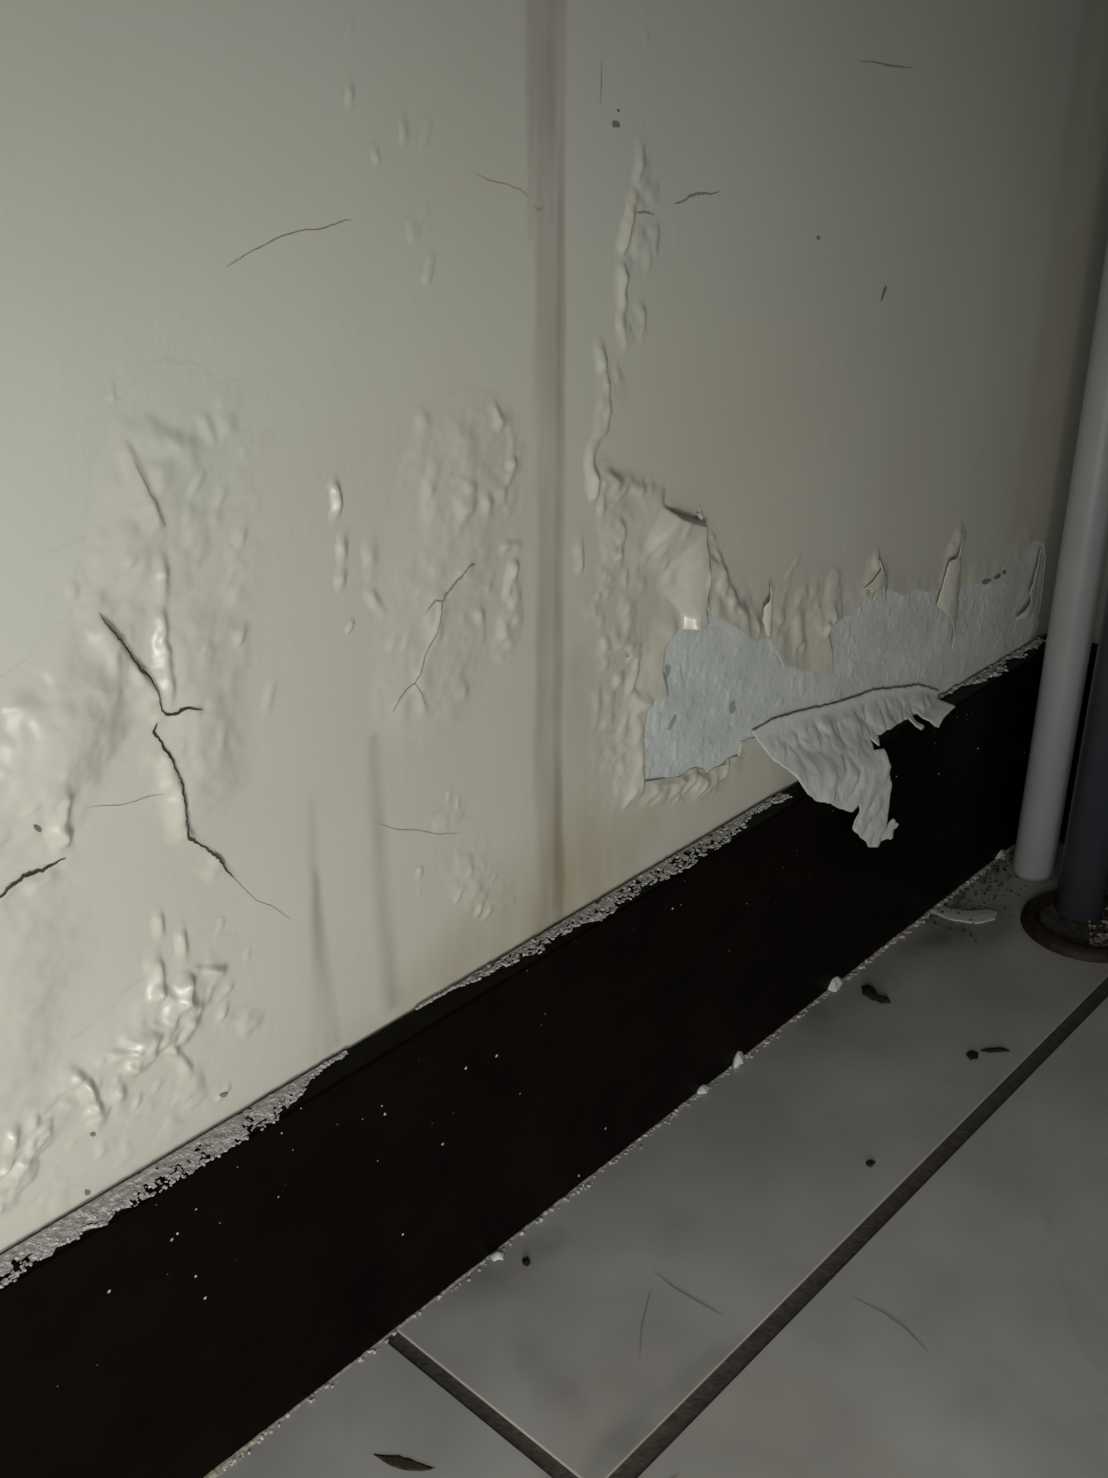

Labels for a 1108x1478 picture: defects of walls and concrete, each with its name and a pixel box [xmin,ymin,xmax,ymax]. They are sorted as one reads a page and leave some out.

crack [227,220,351,267]
crack [134,461,165,525]
crack [393,564,475,712]
peeling [571,460,1053,847]
crack [90,613,290,919]
crack [0,858,66,898]
spalling [0,903,274,1228]